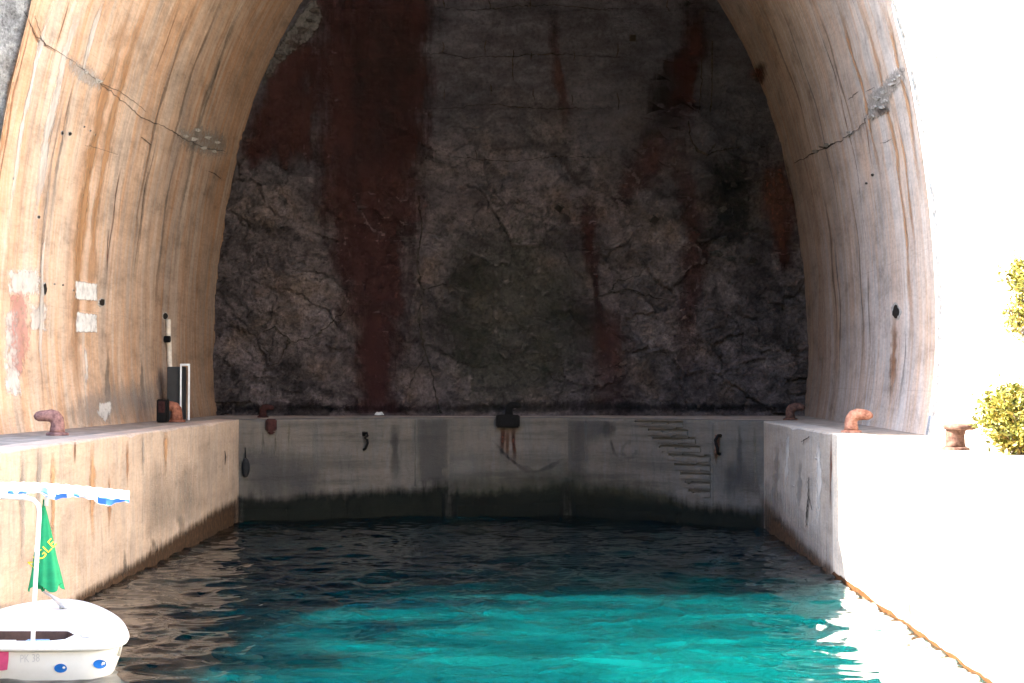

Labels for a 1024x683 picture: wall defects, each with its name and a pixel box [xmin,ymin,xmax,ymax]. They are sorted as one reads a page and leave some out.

crack [24,11,226,179]
crack [795,87,874,163]
spalling [867,69,904,120]
crack [263,310,345,366]
crack [409,196,465,413]
crack [591,275,666,300]
corrosion [501,430,516,456]
damp [450,483,831,574]